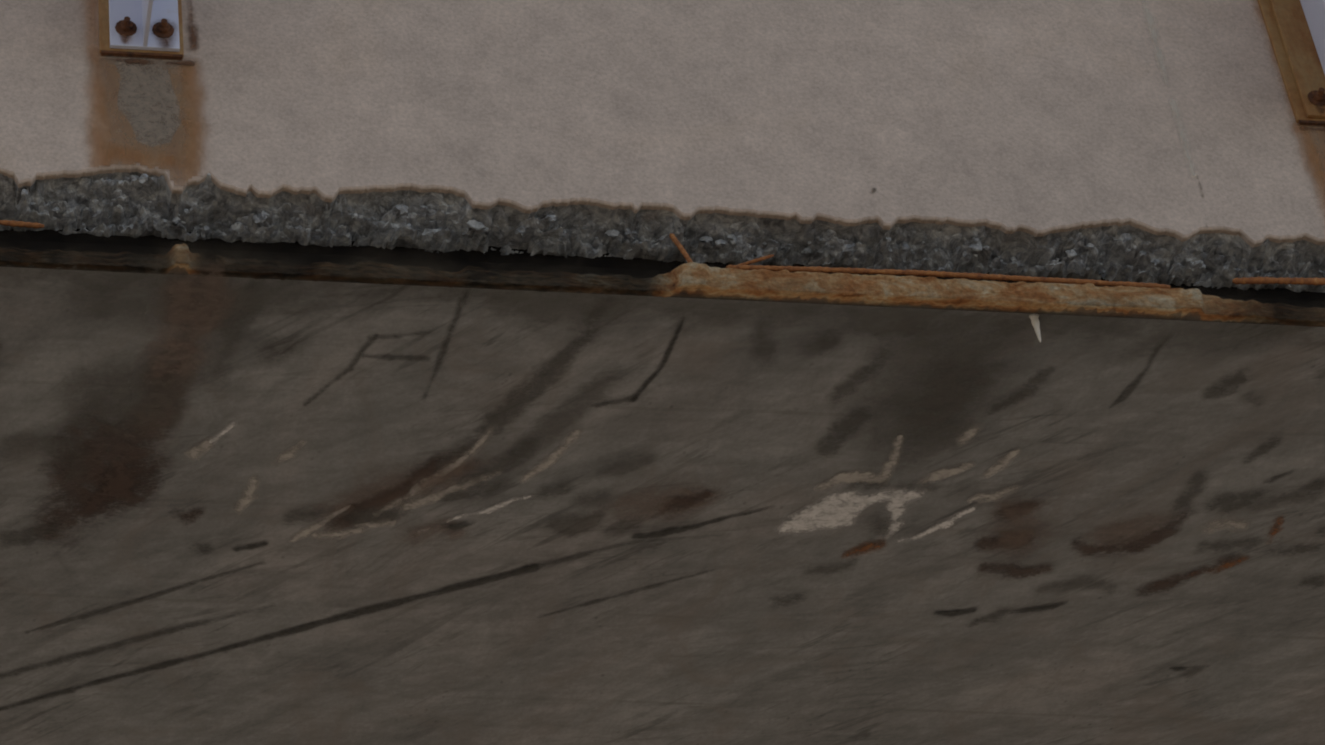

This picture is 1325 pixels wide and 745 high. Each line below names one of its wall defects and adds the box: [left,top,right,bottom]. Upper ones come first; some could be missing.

rust [99,8,198,183]
spalling [0,172,1325,293]
crack [598,321,683,406]
leakage [780,435,1020,542]